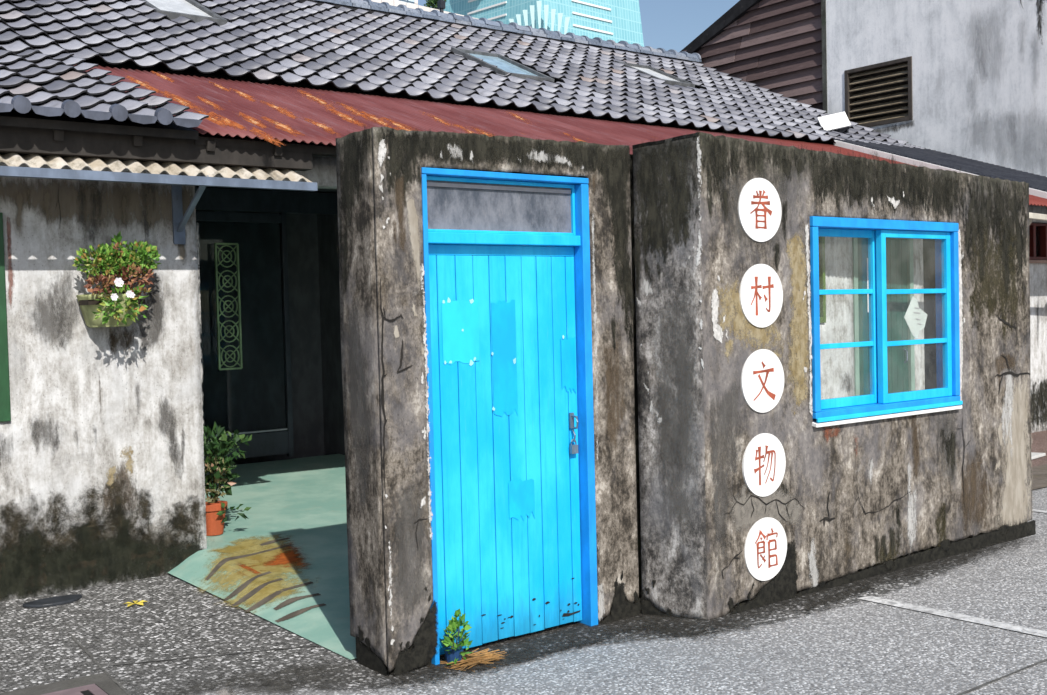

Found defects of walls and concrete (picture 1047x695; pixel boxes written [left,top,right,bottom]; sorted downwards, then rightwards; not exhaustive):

rust [127,71,337,145]
rust [300,90,413,131]
leakage [336,127,1027,520]
crack [380,279,413,494]
leakage [1030,379,1047,432]
leakage [0,447,264,601]
crack [724,484,912,526]